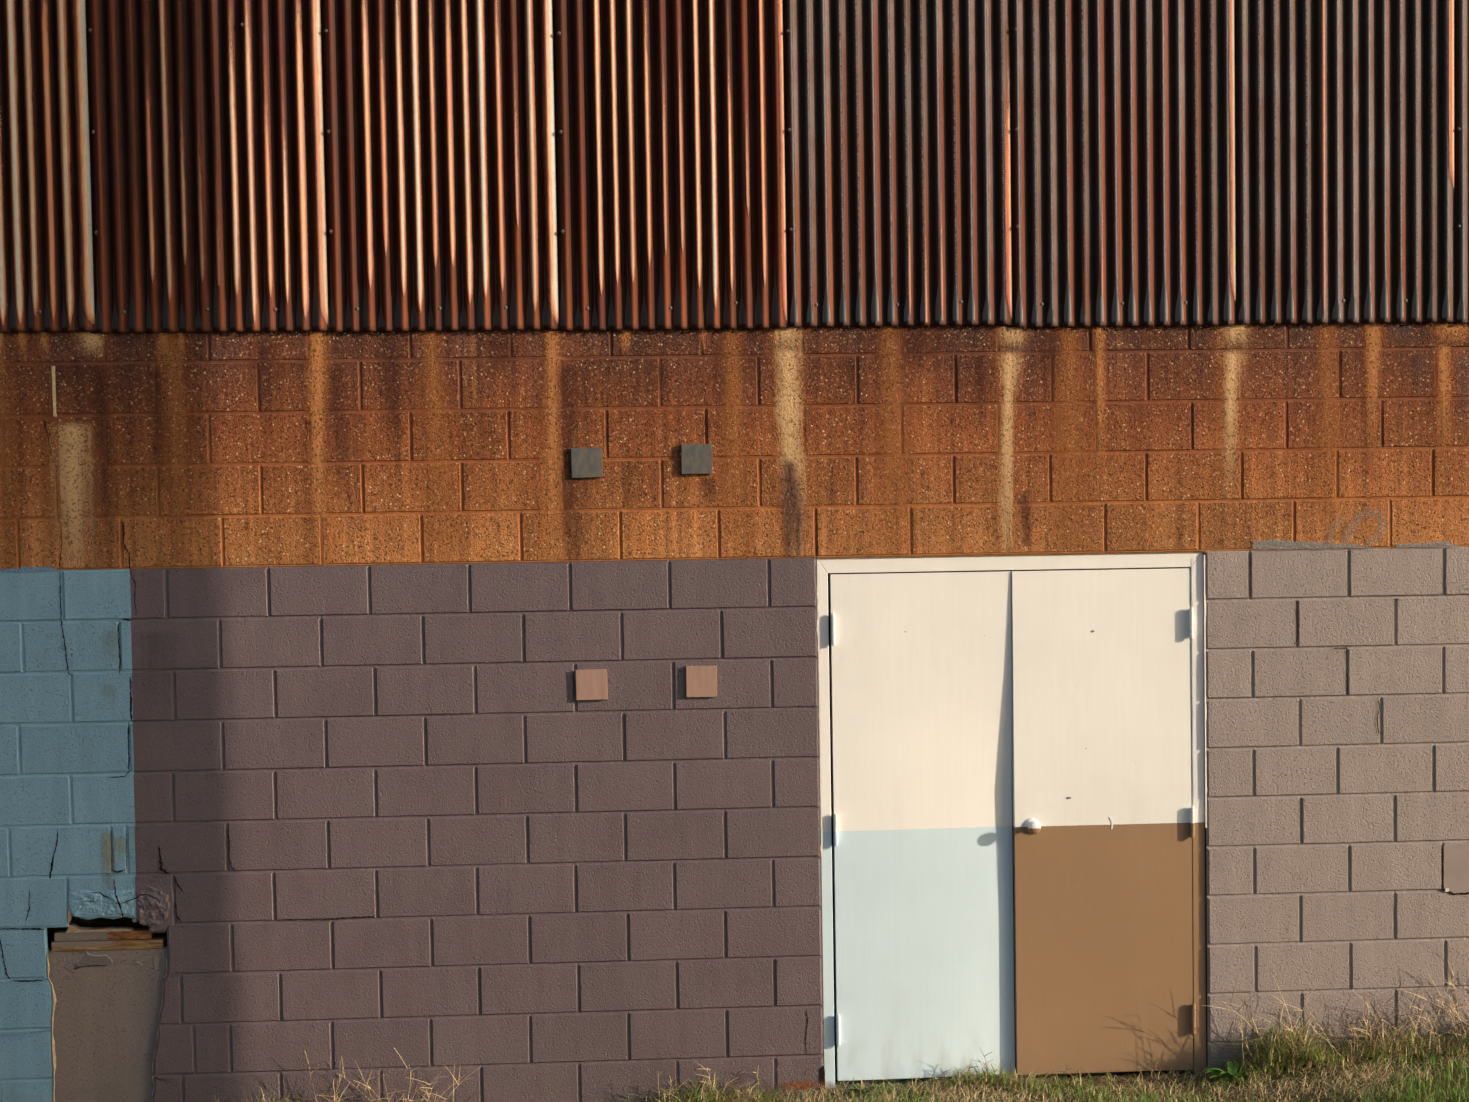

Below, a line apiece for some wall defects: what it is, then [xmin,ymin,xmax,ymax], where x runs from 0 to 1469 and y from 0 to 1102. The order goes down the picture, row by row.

rust [0,0,95,326]
rust [145,0,328,324]
rust [361,0,559,323]
rust [593,0,787,321]
leakage [52,425,95,556]
crack [120,521,137,613]
leakage [775,327,805,556]
leakage [1000,326,1023,526]
crack [0,831,58,982]
spalling [66,889,137,933]
crack [76,831,160,923]
crack [282,914,375,922]